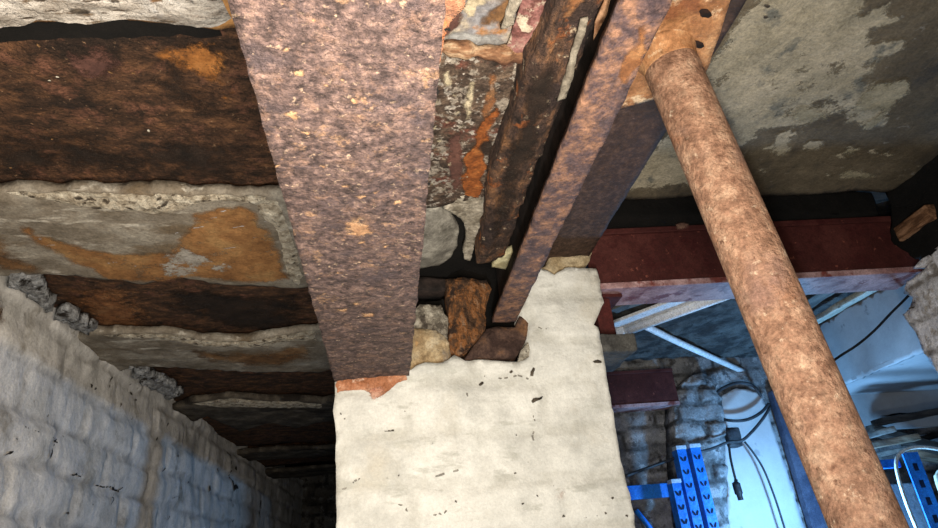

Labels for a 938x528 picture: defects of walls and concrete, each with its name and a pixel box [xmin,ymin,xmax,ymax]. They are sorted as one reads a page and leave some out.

rust [158,43,227,99]
rust [439,0,465,64]
rust [481,0,508,25]
rust [619,28,647,83]
rust [346,217,373,244]